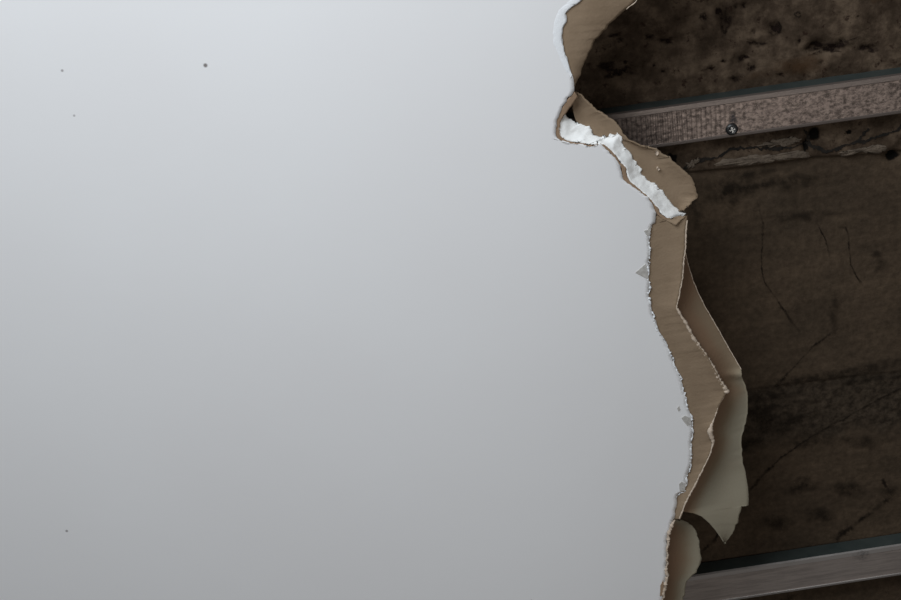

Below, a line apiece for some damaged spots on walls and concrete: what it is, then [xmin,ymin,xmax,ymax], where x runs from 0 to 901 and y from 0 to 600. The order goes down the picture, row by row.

spalling [798,38,874,63]
spalling [655,124,901,169]